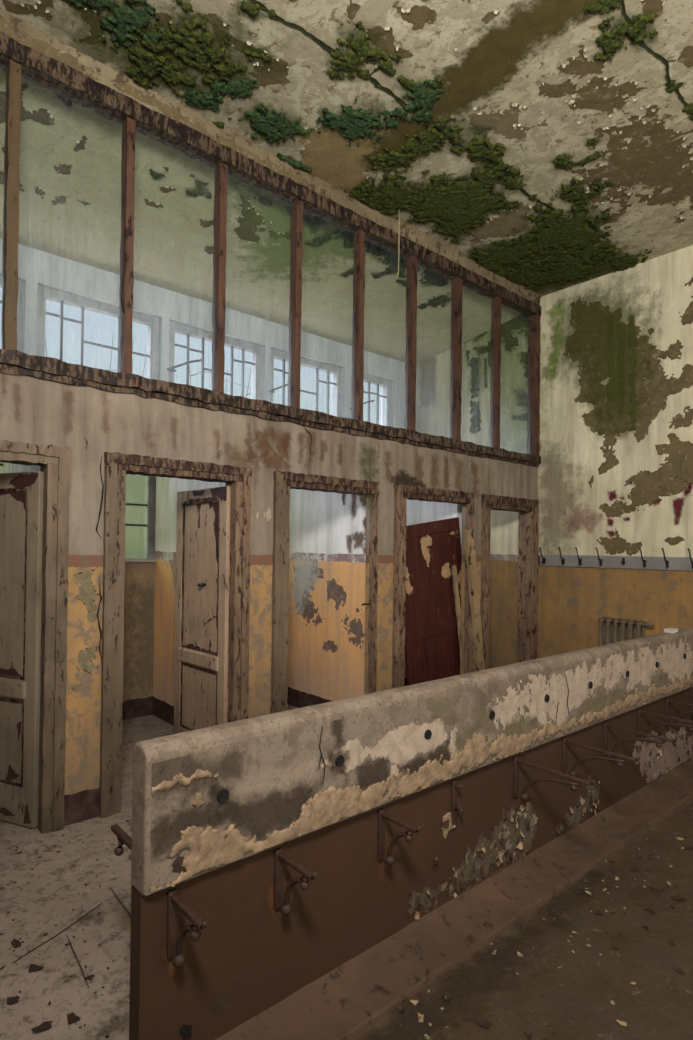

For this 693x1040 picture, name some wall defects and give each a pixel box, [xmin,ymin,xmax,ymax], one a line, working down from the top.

peeling [113,82,390,193]
peeling [346,0,415,71]
peeling [392,0,437,31]
crack [251,0,621,261]
water stain [364,0,600,172]
peeling [468,45,693,226]
crack [617,0,693,121]
peeling [679,277,693,325]
peeling [564,296,693,556]
peeling [291,557,365,653]
peeling [149,627,693,893]
peeling [406,774,600,920]